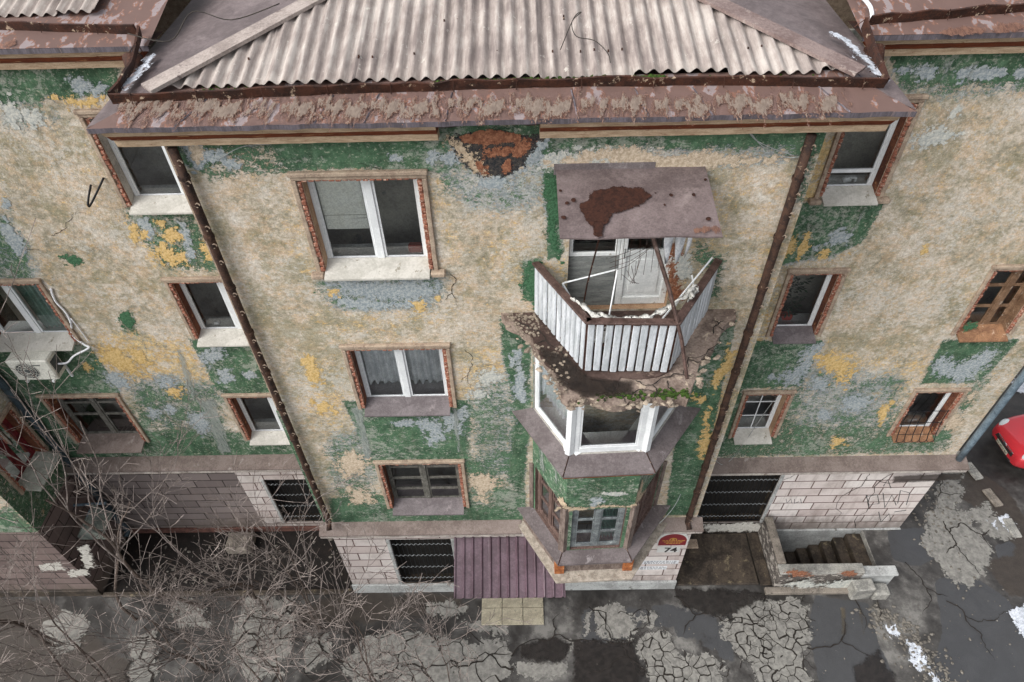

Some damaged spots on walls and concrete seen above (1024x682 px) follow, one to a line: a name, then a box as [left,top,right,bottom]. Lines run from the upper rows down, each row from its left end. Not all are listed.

peeling [47,74,110,112]
peeling [888,62,1024,85]
peeling [123,216,213,271]
rust [559,186,656,237]
flaking render [425,129,803,264]
peeling [81,343,211,438]
peeling [389,319,678,448]
peeling [768,342,895,427]
peeling [929,346,1005,434]
peeling [332,444,384,508]
peeling [466,469,503,506]
crack [204,595,884,682]